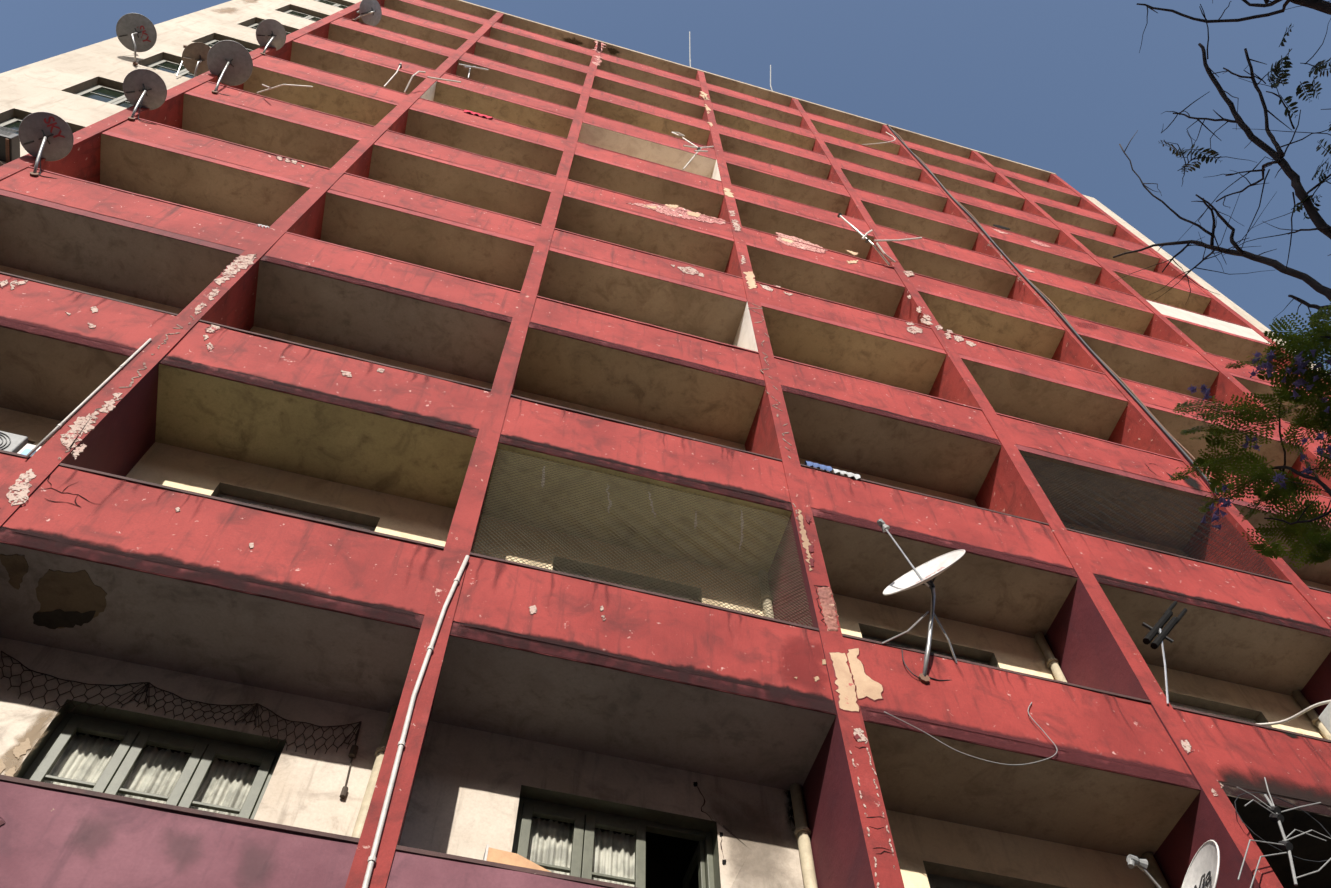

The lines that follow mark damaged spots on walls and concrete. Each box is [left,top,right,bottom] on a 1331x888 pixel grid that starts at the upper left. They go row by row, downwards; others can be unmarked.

peeling [627,188,741,232]
peeling [775,232,828,253]
peeling [0,280,28,290]
peeling [58,254,257,460]
peeling [0,469,37,509]
flaking render [0,554,107,629]
damp [450,622,836,713]
peeling [813,648,896,869]